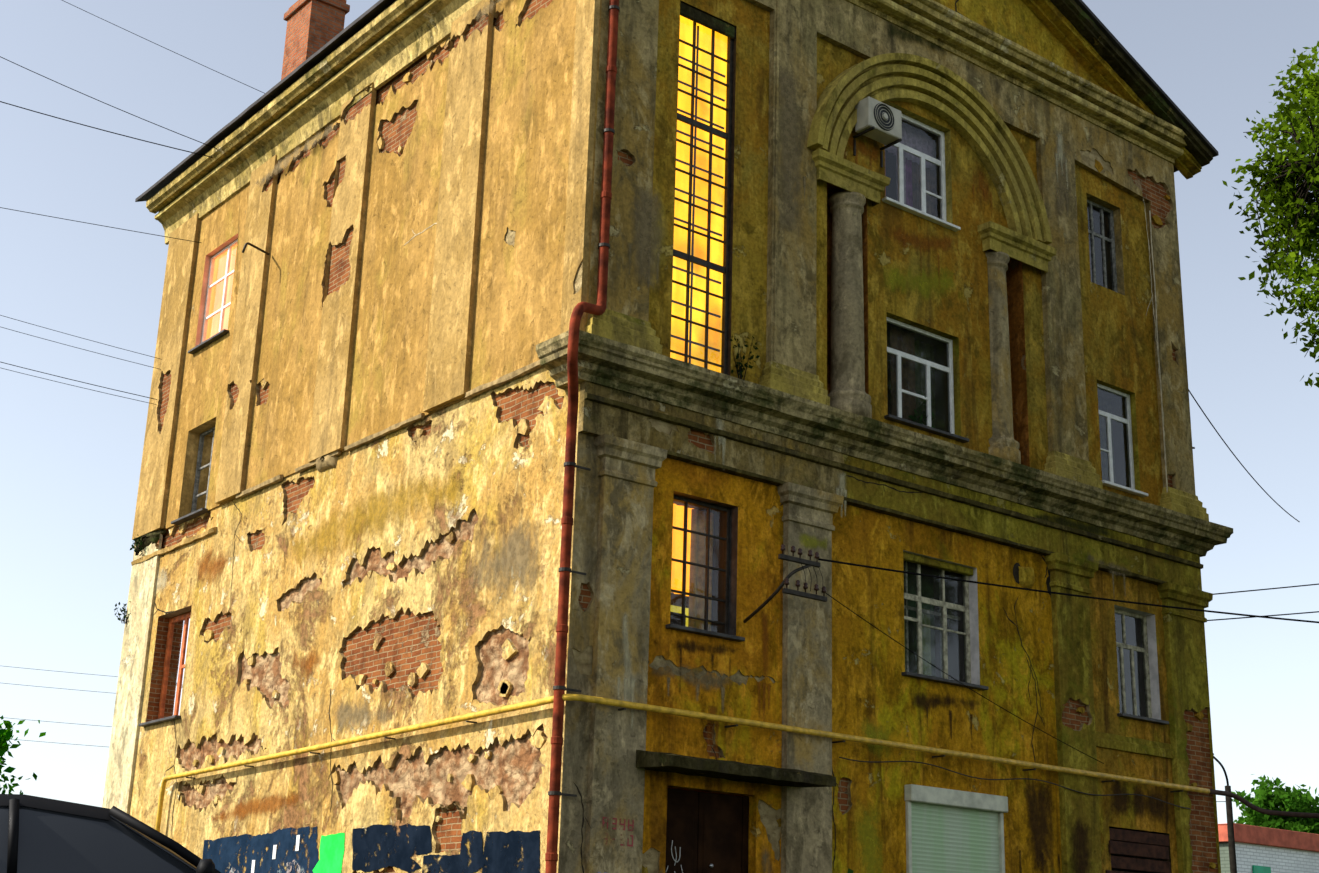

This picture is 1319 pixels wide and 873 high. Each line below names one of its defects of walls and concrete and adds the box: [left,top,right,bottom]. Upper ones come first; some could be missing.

spalling [262,0,552,192]
spalling [321,224,354,307]
spalling [491,380,564,449]
spalling [342,508,478,589]
spalling [276,572,322,612]
spalling [339,607,443,700]
spalling [472,624,531,706]
spalling [176,732,266,812]
spalling [328,723,547,853]
damp [1019,781,1110,873]
damp [1112,780,1169,821]
spalling [1183,707,1218,873]